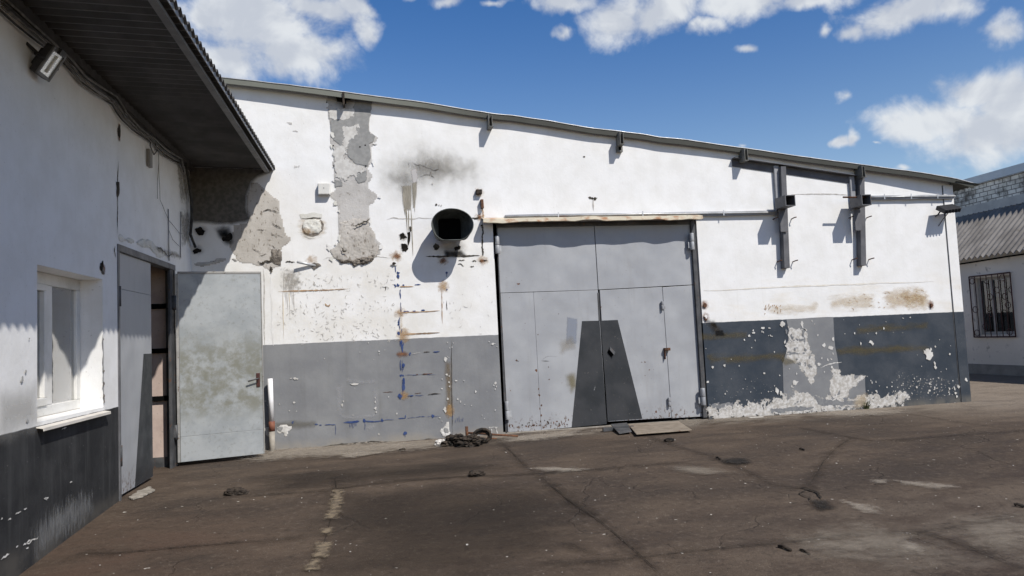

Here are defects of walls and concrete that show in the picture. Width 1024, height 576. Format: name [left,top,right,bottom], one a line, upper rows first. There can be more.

flaking render [193,183,291,273]
flaking render [312,92,383,270]
damp [402,182,417,249]
corrosion [397,282,447,356]
peeling [706,317,968,419]